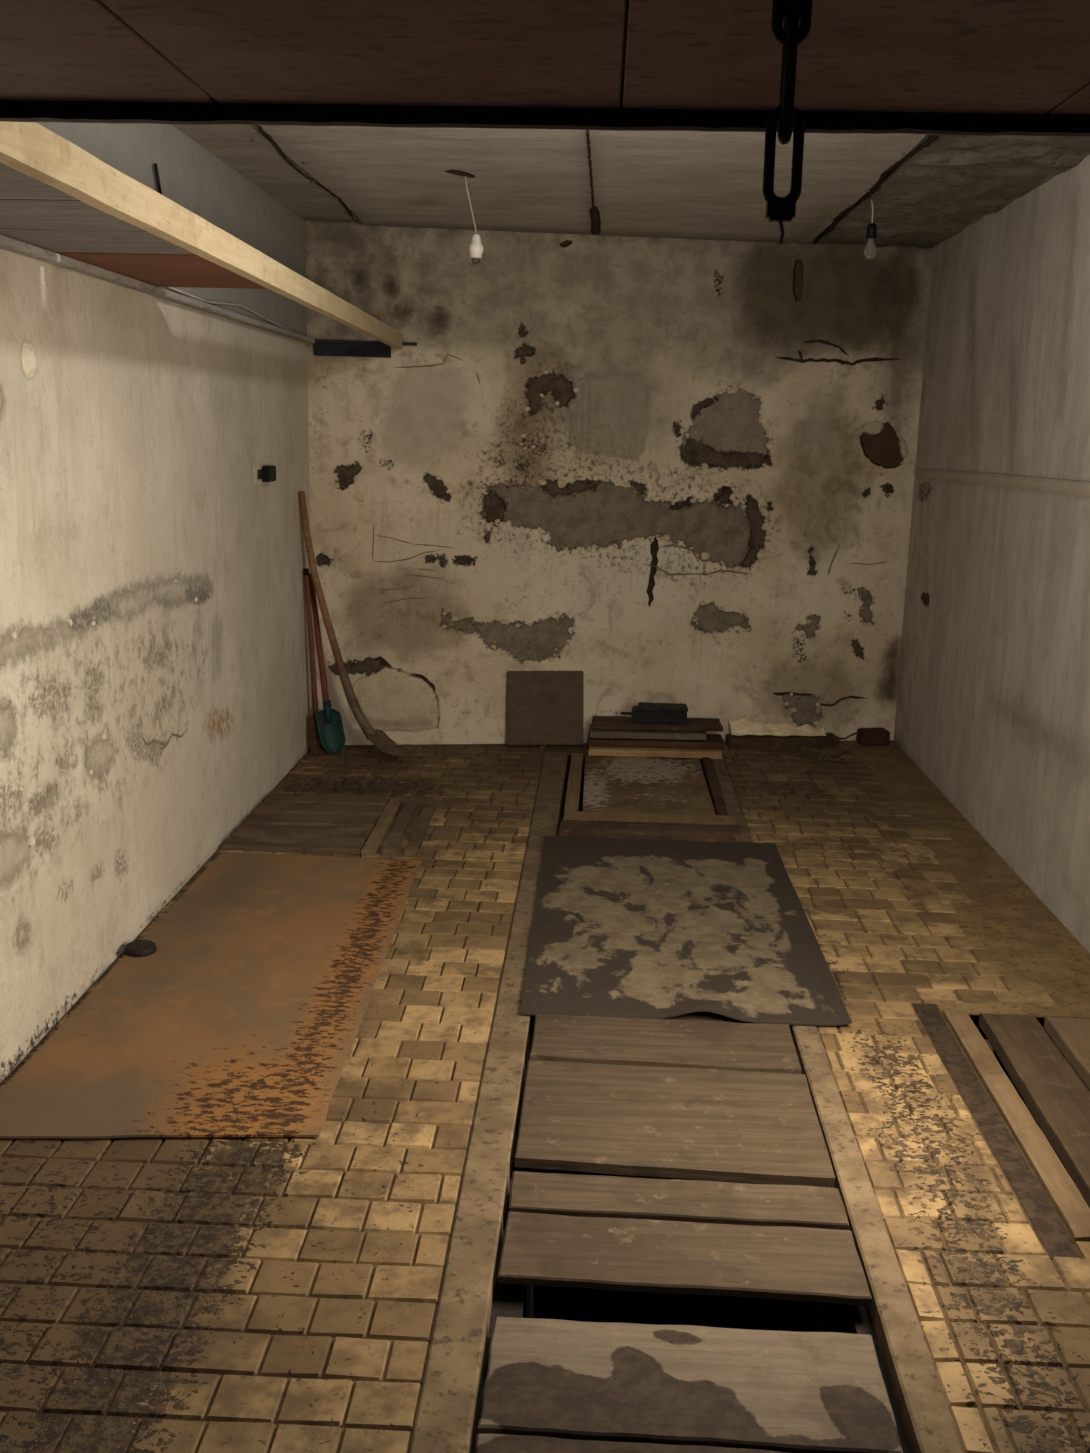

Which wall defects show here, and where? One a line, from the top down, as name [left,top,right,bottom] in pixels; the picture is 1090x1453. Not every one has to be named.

crack [774,340,899,366]
flaking render [334,430,395,491]
flaking render [423,322,778,580]
flaking render [856,396,907,498]
crack [644,537,751,607]
flaking render [439,609,576,664]
flaking render [690,602,752,634]